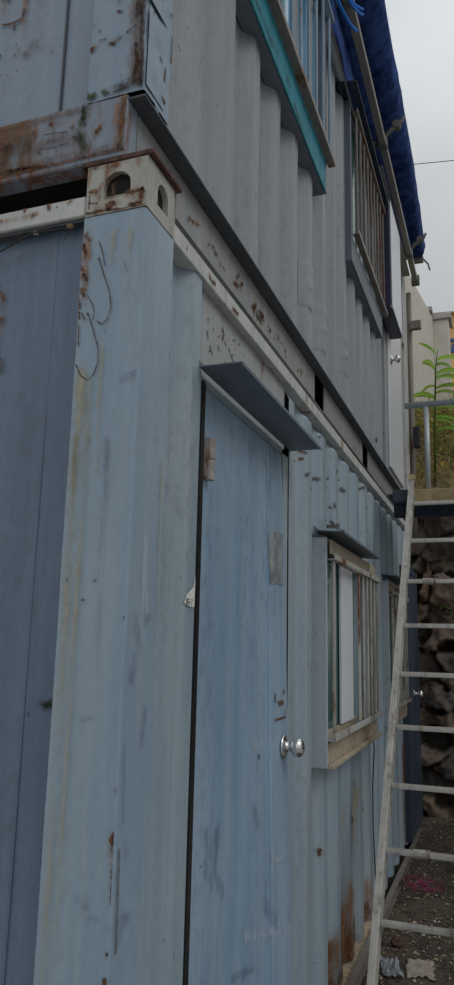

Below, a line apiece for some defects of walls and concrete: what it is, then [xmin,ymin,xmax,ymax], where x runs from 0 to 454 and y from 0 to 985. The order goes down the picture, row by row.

corrosion [126,0,145,86]
corrosion [0,93,149,215]
corrosion [328,885,355,985]
corrosion [364,883,373,922]